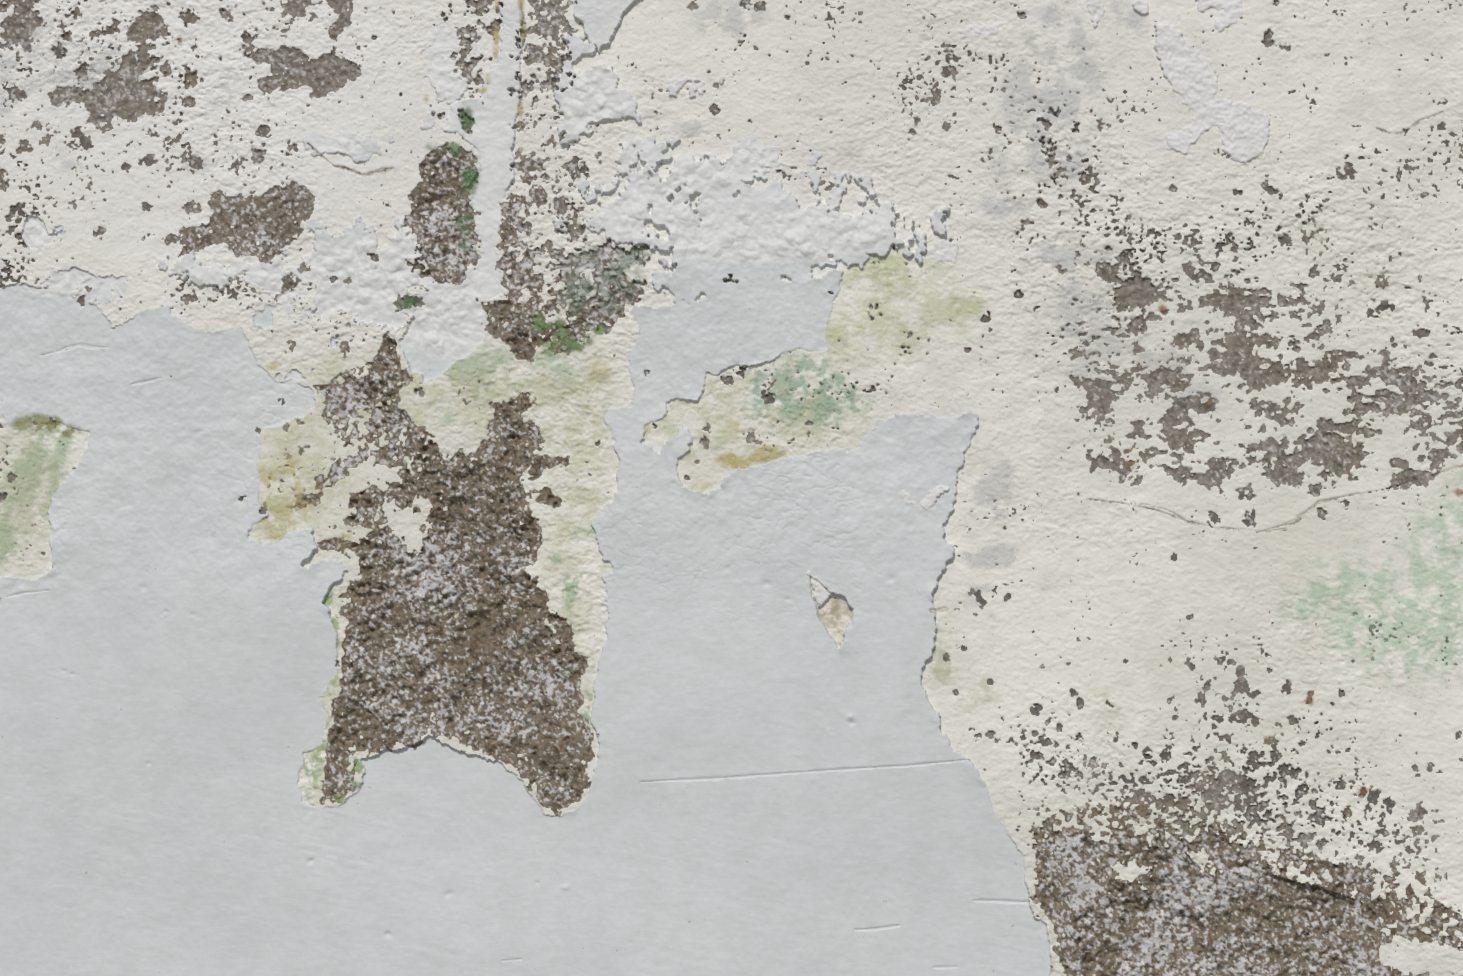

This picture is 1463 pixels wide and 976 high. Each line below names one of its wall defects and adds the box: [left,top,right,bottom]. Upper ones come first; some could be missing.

peeling [457,109,475,134]
peeling [70,286,92,306]
peeling [393,286,427,320]
peeling [0,414,90,580]
peeling [902,485,950,510]
spalling [286,334,599,816]
peeling [806,570,852,648]